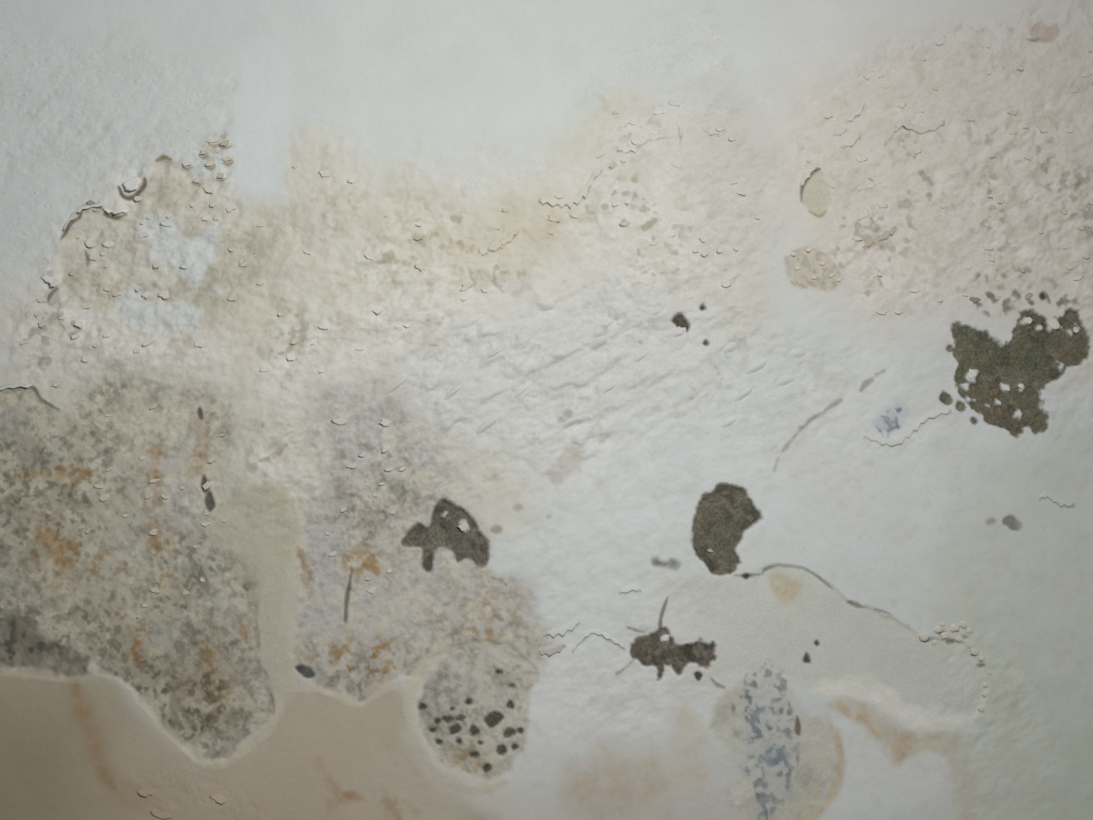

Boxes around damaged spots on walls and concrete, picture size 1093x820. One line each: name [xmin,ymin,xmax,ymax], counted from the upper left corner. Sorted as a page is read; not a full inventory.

peeling [45,138,322,349]
damp [224,78,655,391]
peeling [768,0,1093,440]
damp [968,263,1082,319]
peeling [541,408,589,490]
damp [868,399,912,439]
damp [0,601,93,680]
peeling [0,359,563,795]
peeling [614,482,991,820]